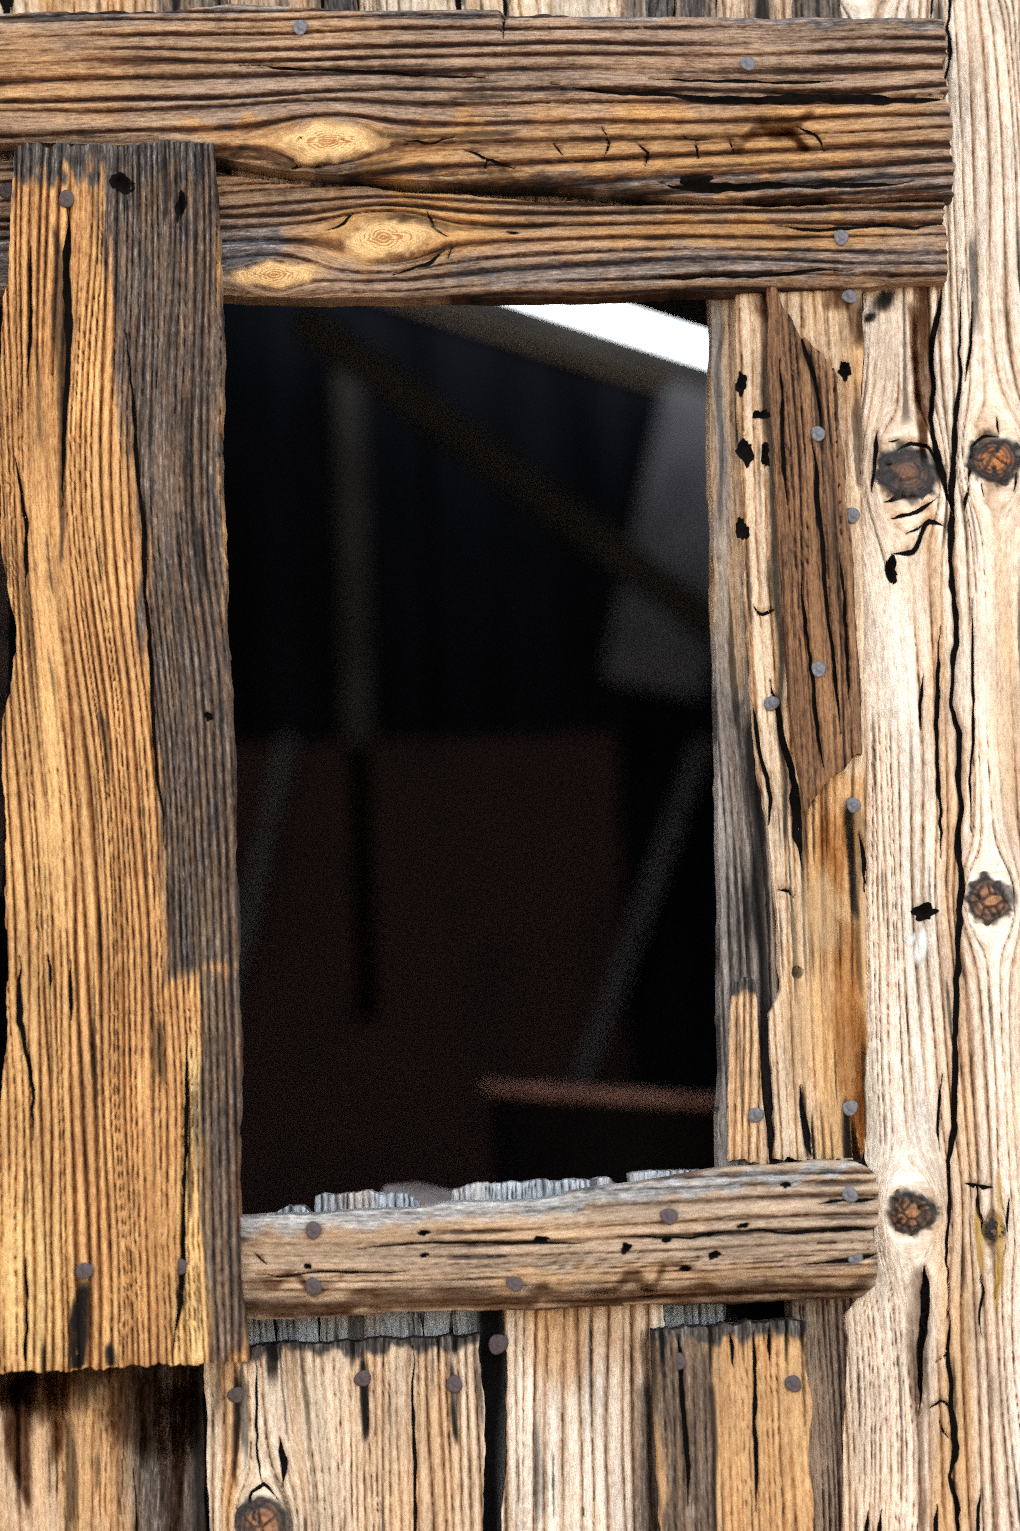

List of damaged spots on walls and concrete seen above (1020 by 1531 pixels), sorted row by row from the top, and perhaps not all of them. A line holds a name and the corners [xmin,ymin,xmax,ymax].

crack [0,0,14,14]
crack [242,65,484,78]
crack [553,0,952,193]
crack [405,138,514,172]
crack [776,223,934,232]
crack [655,268,852,280]
crack [753,339,850,896]
crack [858,834,866,892]
crack [871,269,1020,1531]
crack [799,1089,811,1155]
crack [864,1510,882,1531]